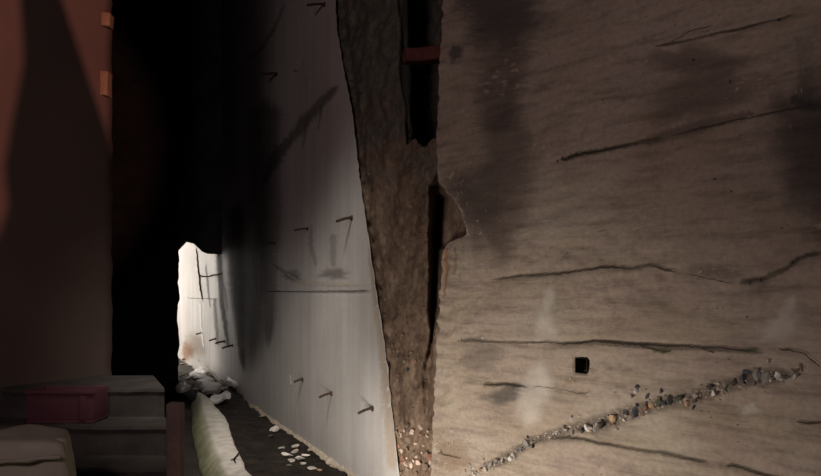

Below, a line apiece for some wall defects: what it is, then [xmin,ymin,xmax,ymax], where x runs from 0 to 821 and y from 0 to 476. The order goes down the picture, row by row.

crack [655,14,791,46]
crack [556,138,659,162]
crack [497,253,818,284]
water stain [217,210,245,366]
crack [471,339,757,353]
crack [484,384,588,394]
crack [533,437,701,462]